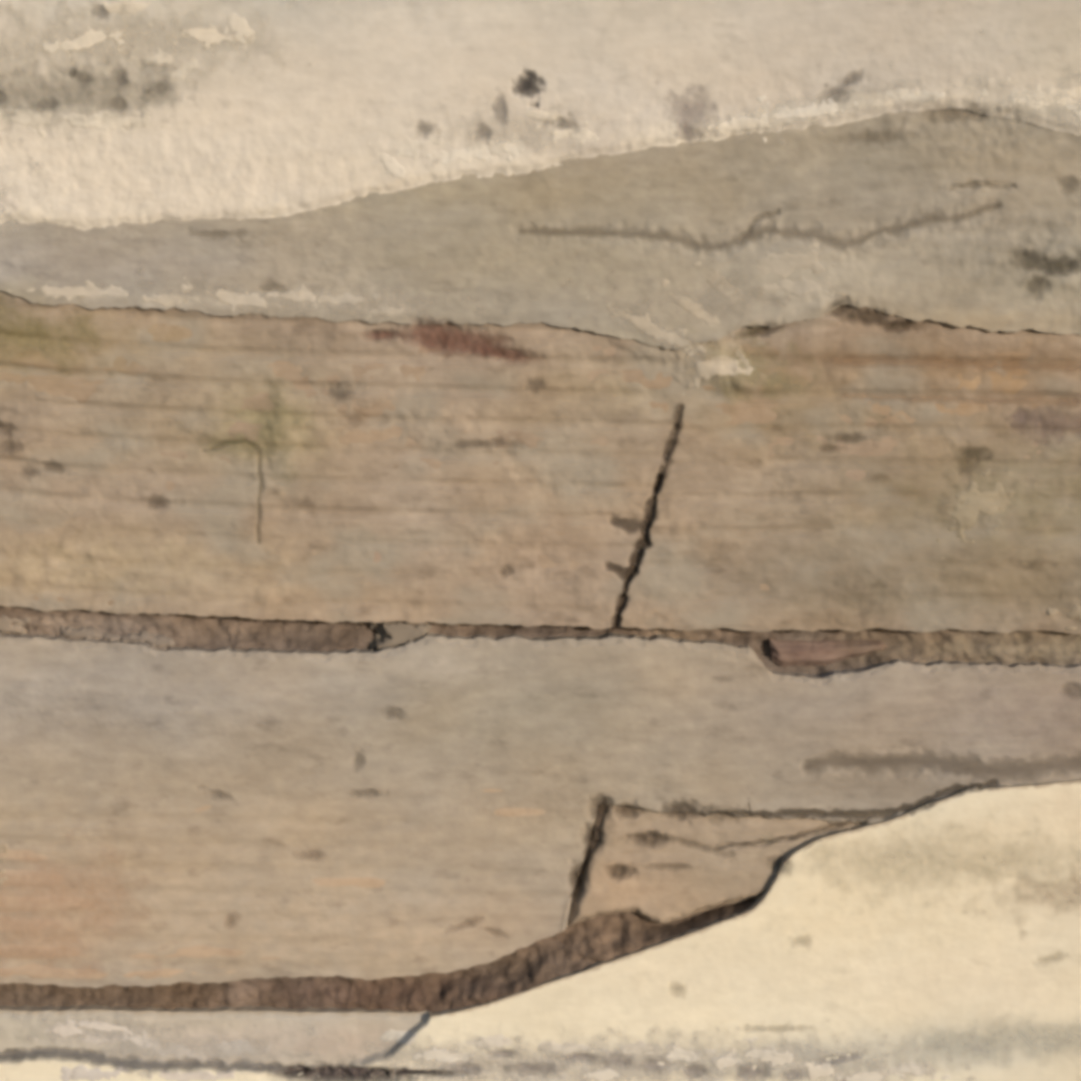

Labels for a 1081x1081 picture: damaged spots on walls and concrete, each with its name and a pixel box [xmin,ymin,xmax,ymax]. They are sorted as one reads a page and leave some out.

flaking render [21,0,255,91]
spalling [516,72,538,95]
spalling [0,82,1081,634]
crack [607,405,683,628]
spalling [0,632,1081,988]
crack [572,798,606,897]
crack [707,780,997,819]
flaking render [35,1014,271,1081]
flaking render [369,1029,950,1081]